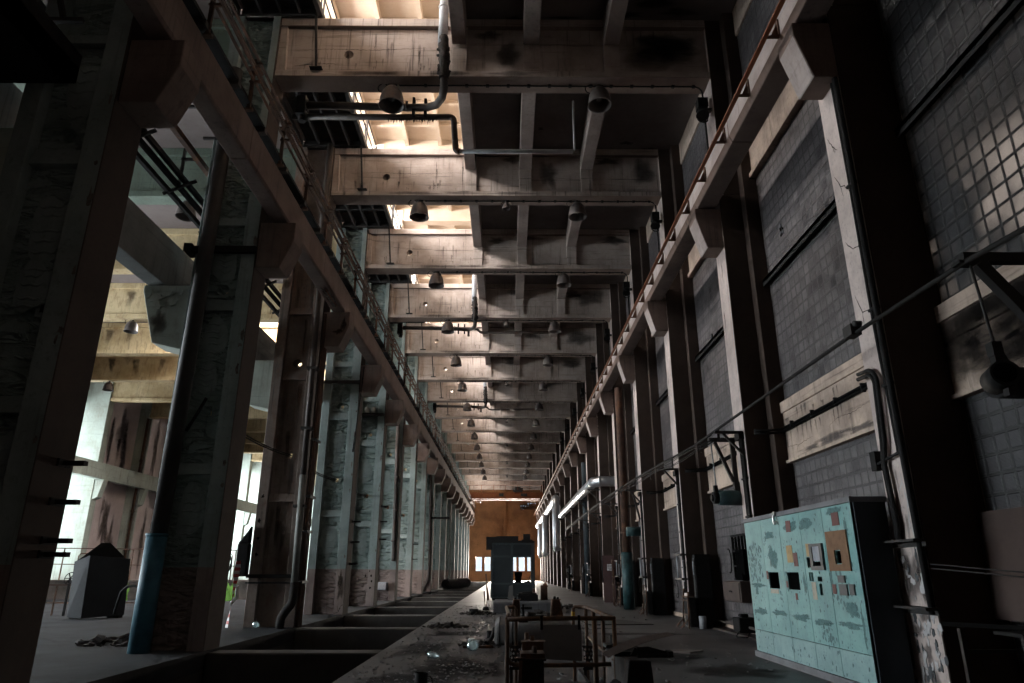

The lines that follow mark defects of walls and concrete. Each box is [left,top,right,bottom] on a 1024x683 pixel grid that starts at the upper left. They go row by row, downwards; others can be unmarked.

damp [107,415,127,468]
damp [150,431,160,475]
damp [808,422,873,450]
damp [99,500,113,543]
damp [137,515,146,567]
peeling [900,547,934,600]
peeling [910,613,949,683]